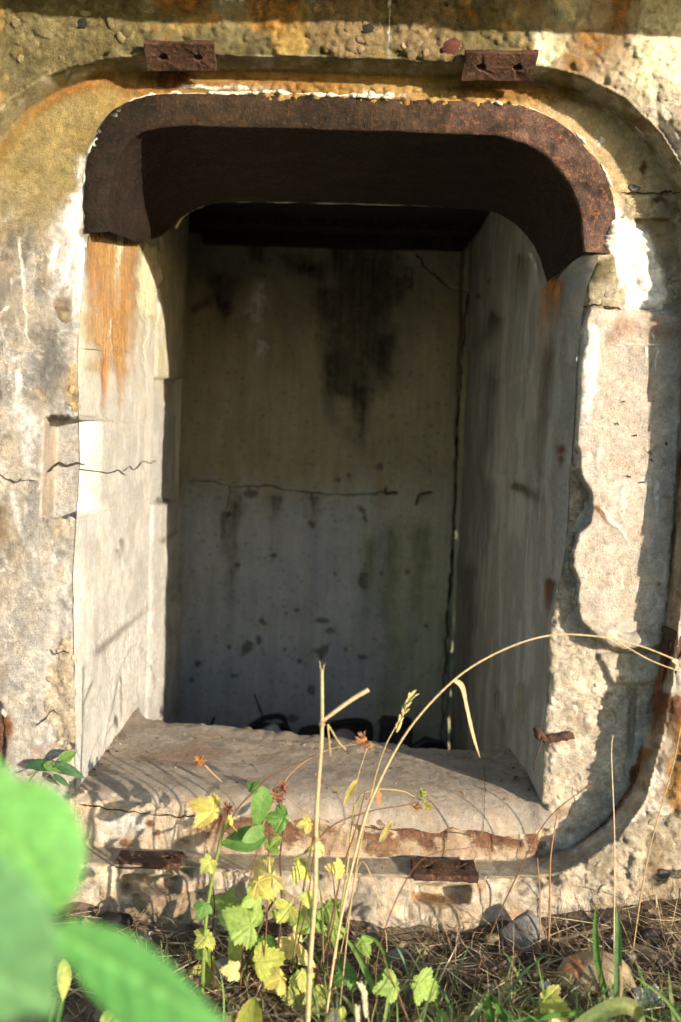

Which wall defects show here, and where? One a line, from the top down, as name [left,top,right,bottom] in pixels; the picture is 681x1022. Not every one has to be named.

corrosion [242,0,297,31]
corrosion [28,71,351,117]
corrosion [89,232,142,392]
crack [0,461,155,484]
crack [189,480,397,516]
spalling [550,448,590,627]
spalling [543,641,634,824]
corrosion [653,643,681,811]
corrosion [353,819,454,857]
corrosion [466,830,546,855]